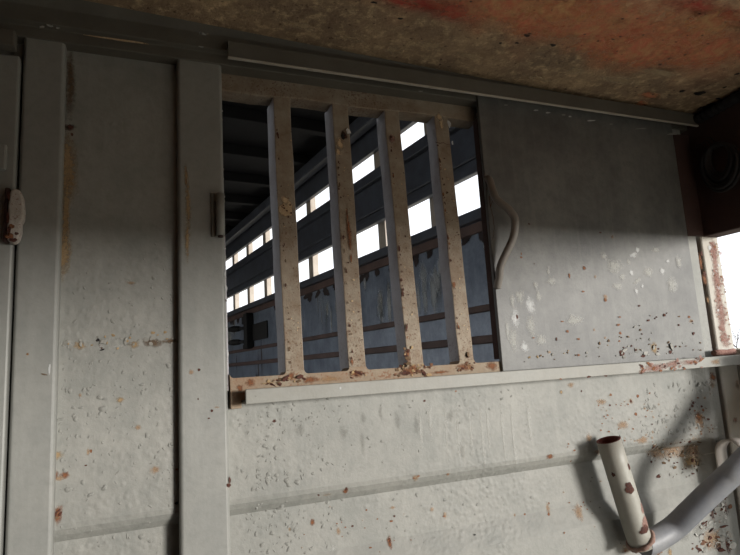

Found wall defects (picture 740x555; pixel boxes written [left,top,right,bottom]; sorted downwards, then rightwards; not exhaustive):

corrosion [237,349,317,391]
corrosion [394,346,447,377]
corrosion [456,352,475,372]
peeling [616,313,704,373]